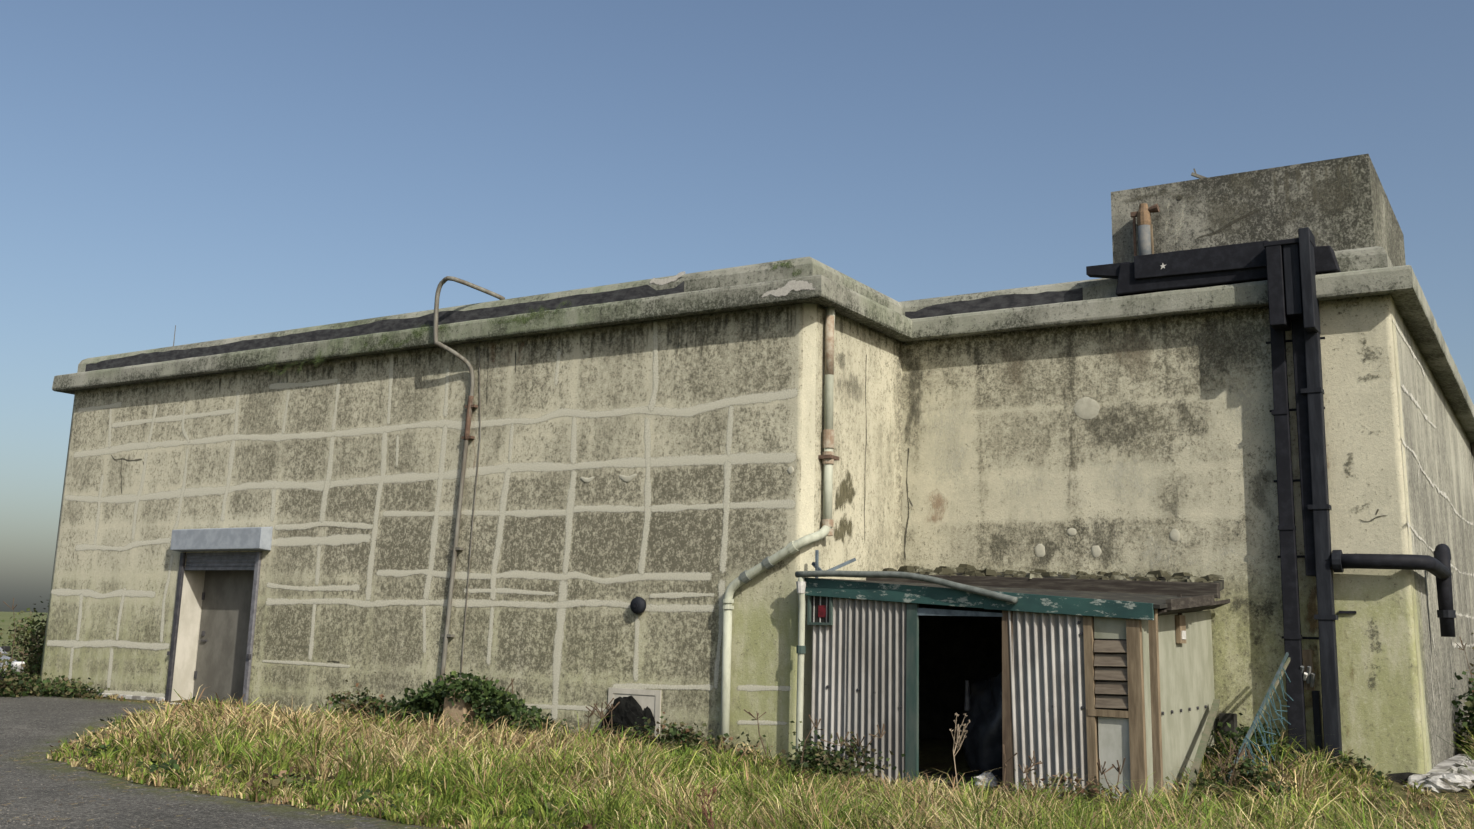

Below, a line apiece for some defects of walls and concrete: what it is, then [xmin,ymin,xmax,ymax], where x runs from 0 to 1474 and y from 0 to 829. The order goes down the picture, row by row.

spalling [761,280,816,298]
leakage [1087,403,1148,446]
leakage [1174,401,1204,435]
leakage [834,471,855,541]
leakage [1034,520,1122,567]